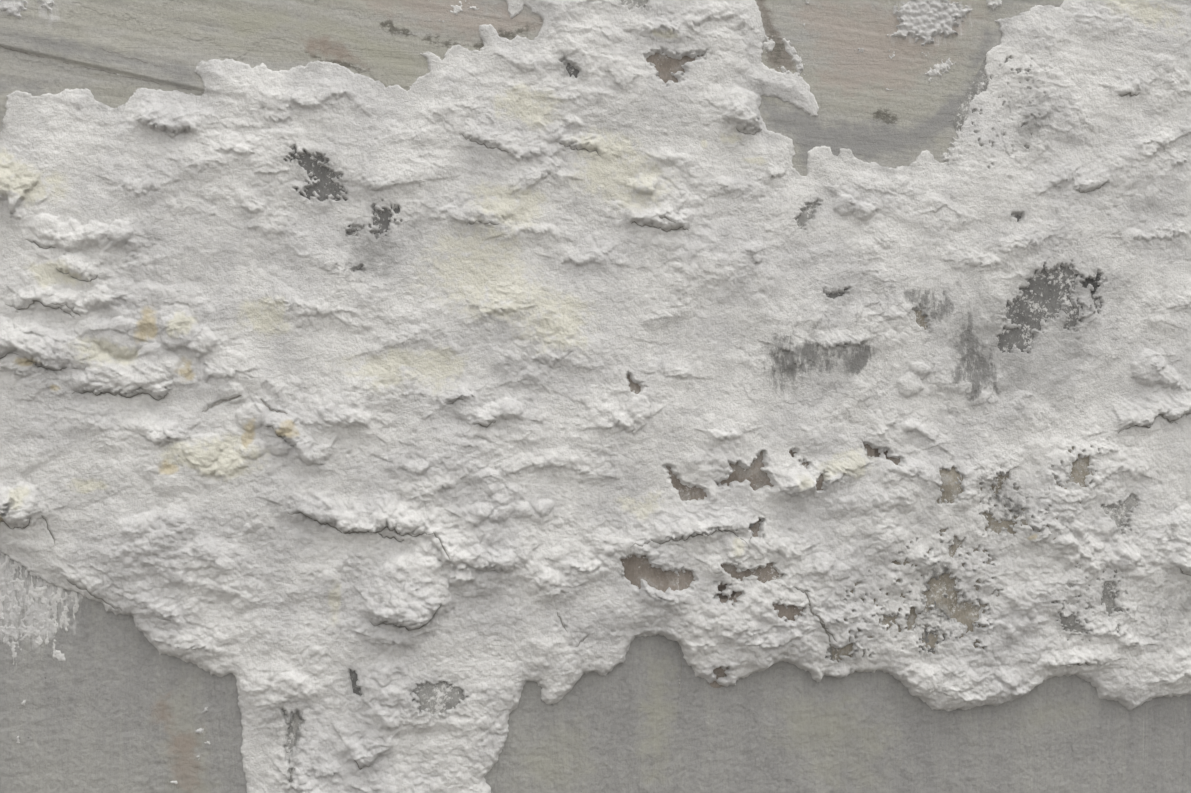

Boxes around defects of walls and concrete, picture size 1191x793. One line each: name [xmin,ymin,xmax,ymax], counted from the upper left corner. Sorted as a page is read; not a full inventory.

water stain [536,109,694,227]
water stain [321,218,435,290]
water stain [387,186,580,345]
water stain [736,299,896,410]
water stain [918,233,1128,431]
peeling [997,265,1101,353]
crack [1119,413,1191,432]
peeling [666,451,774,501]
crack [288,512,450,559]
peeling [620,555,695,593]
peeling [717,563,784,605]
spalling [825,529,1000,662]